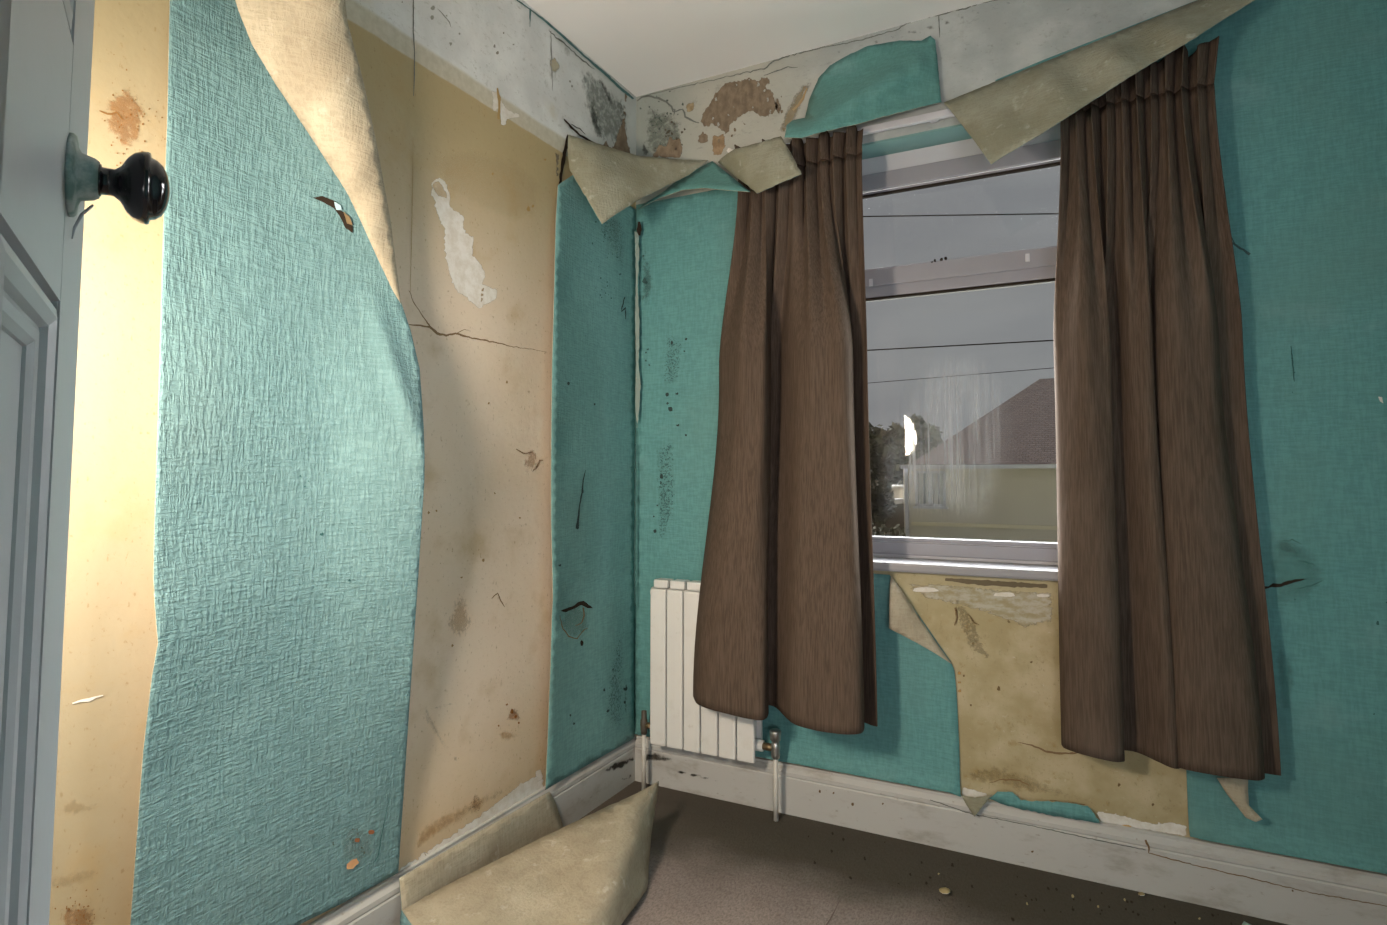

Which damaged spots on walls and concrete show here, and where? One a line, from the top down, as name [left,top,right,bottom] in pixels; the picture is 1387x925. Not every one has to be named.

leakage [584,78,622,141]
spalling [653,77,783,158]
peeling [431,178,497,308]
crack [409,157,545,352]
flaking render [400,770,544,871]
flaking render [962,787,987,797]
flaking render [1097,812,1187,836]